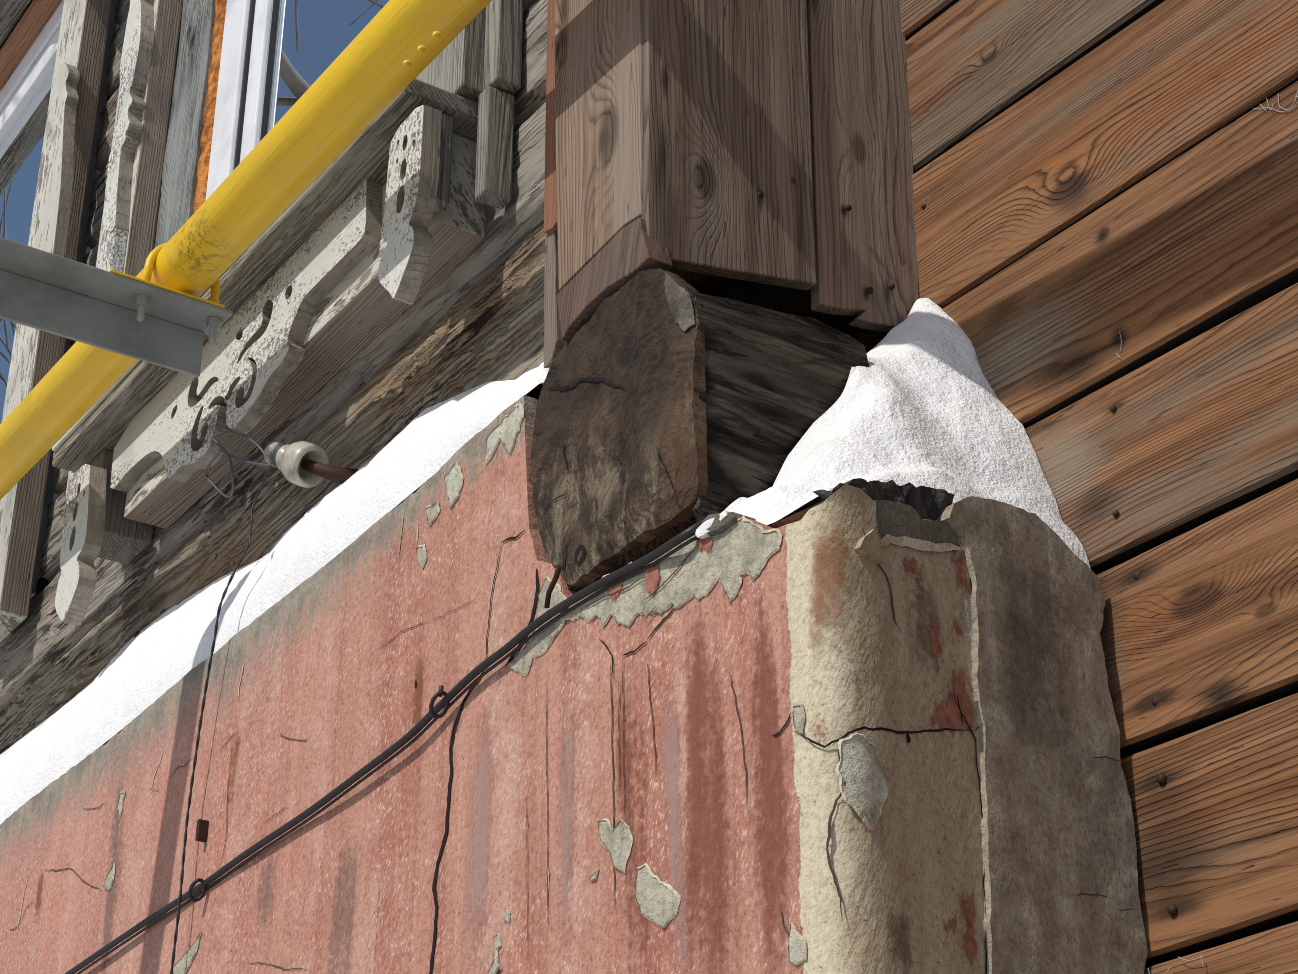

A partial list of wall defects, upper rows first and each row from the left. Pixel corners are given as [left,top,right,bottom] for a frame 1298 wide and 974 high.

peeling [506,515,782,676]
crack [380,431,568,974]
crack [580,549,695,828]
peeling [791,703,888,830]
crack [727,670,983,917]
crack [45,867,103,891]
peeling [173,931,202,974]
peeling [487,906,511,974]
peeling [589,818,681,928]
crack [981,871,989,974]